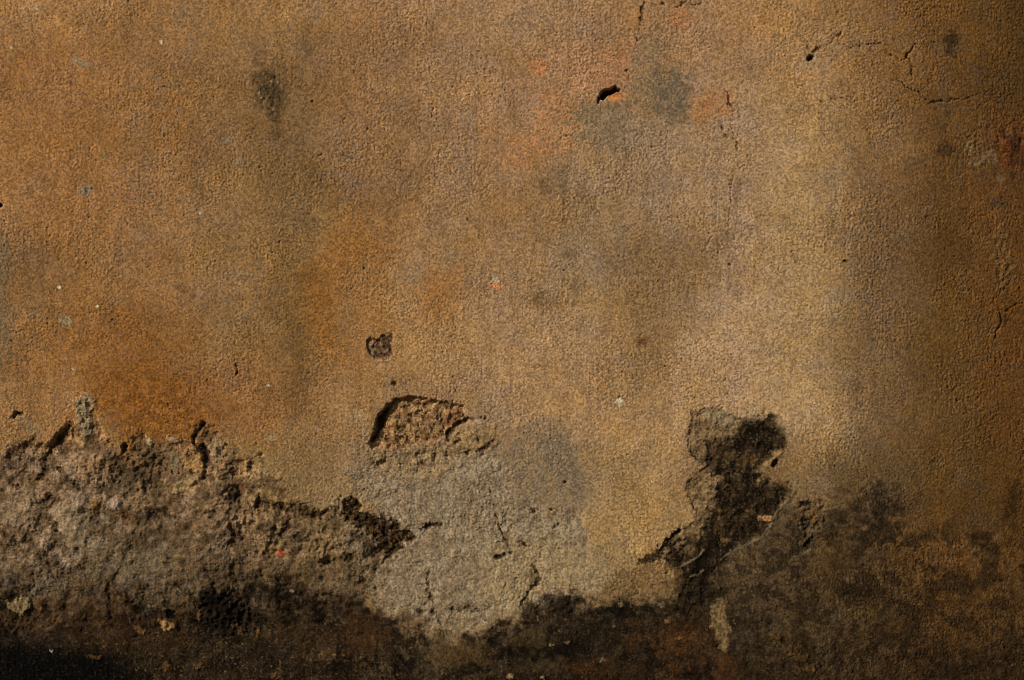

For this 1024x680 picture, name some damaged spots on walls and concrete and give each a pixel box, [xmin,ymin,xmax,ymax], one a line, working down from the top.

peeling [502,29,640,174]
crack [797,31,986,105]
spalling [366,332,394,361]
spalling [0,371,622,635]
leakage [0,469,1024,680]
spalling [637,405,832,653]